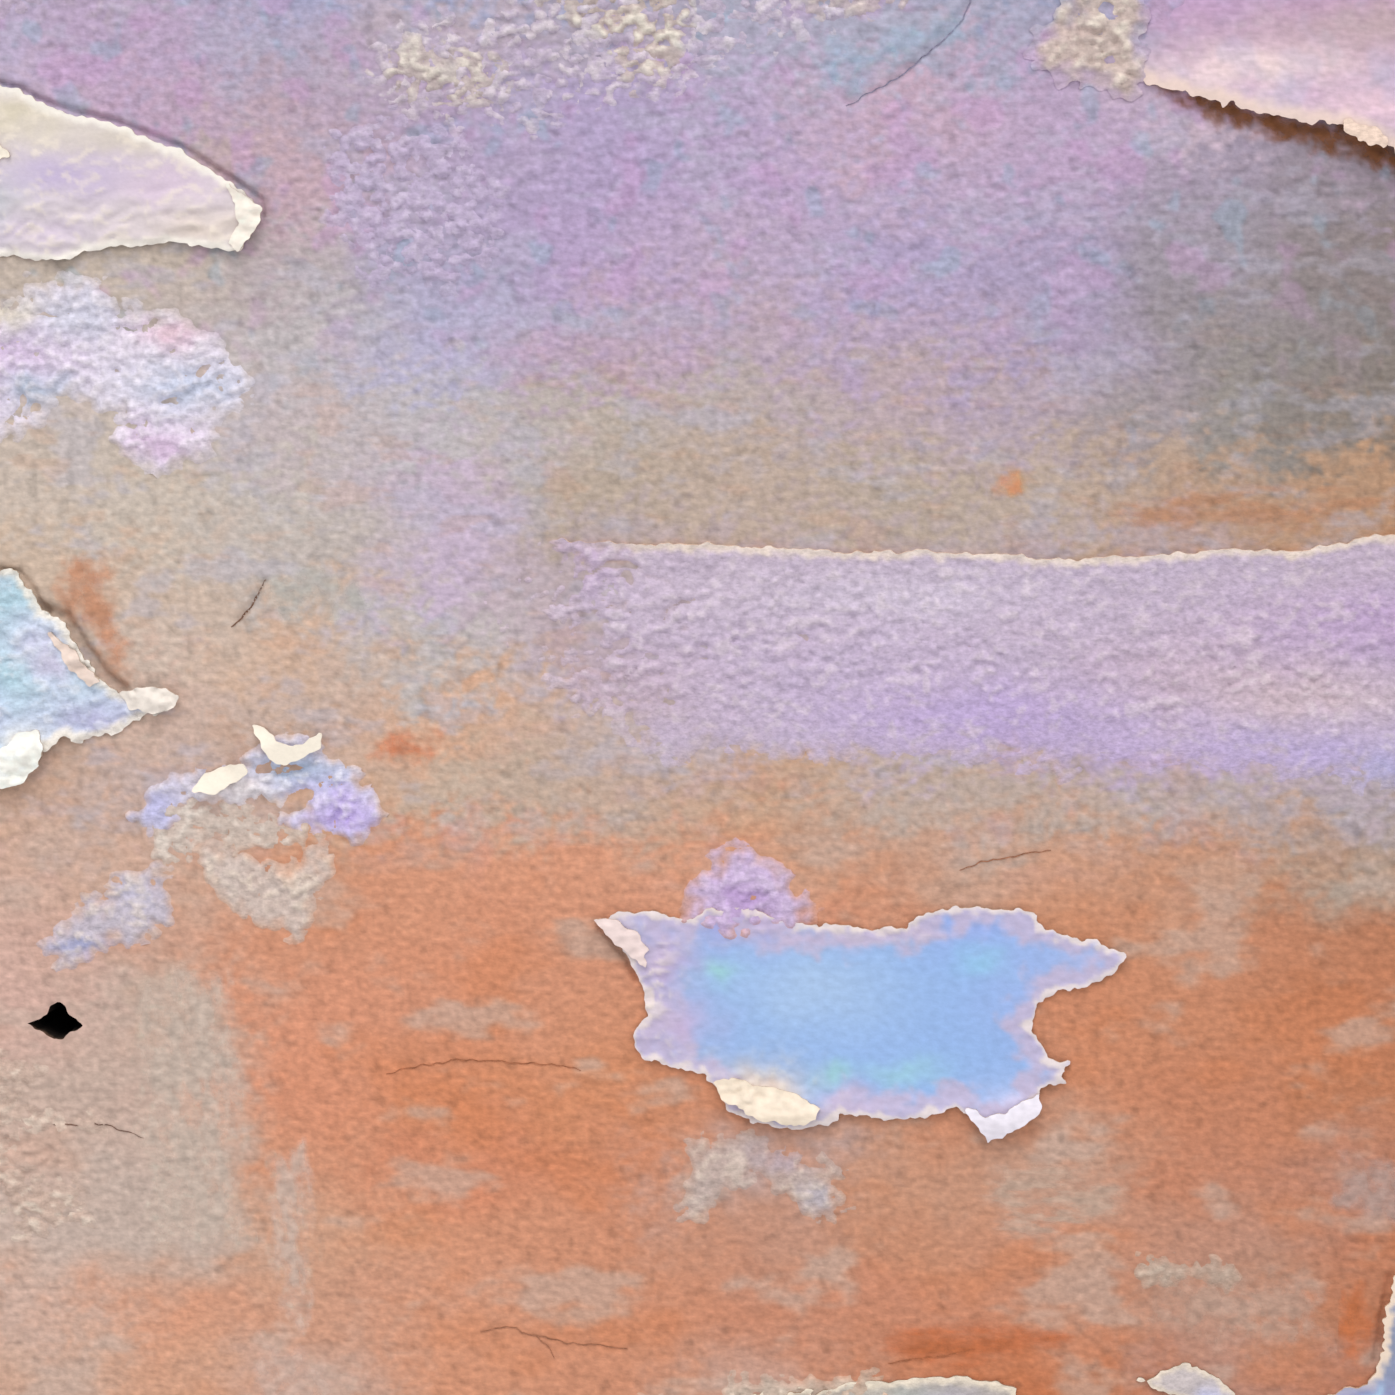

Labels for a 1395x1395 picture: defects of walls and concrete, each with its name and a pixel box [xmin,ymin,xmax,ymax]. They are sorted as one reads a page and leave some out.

spalling [318,0,909,308]
peeling [1023,0,1395,153]
rust [1170,90,1395,168]
spalling [0,85,263,479]
peeling [0,568,179,789]
spalling [518,534,1395,796]
spalling [36,725,390,973]
peeling [594,837,1126,1225]
peeling [721,1367,1016,1395]
peeling [1136,1362,1235,1395]
peeling [1328,1275,1395,1395]